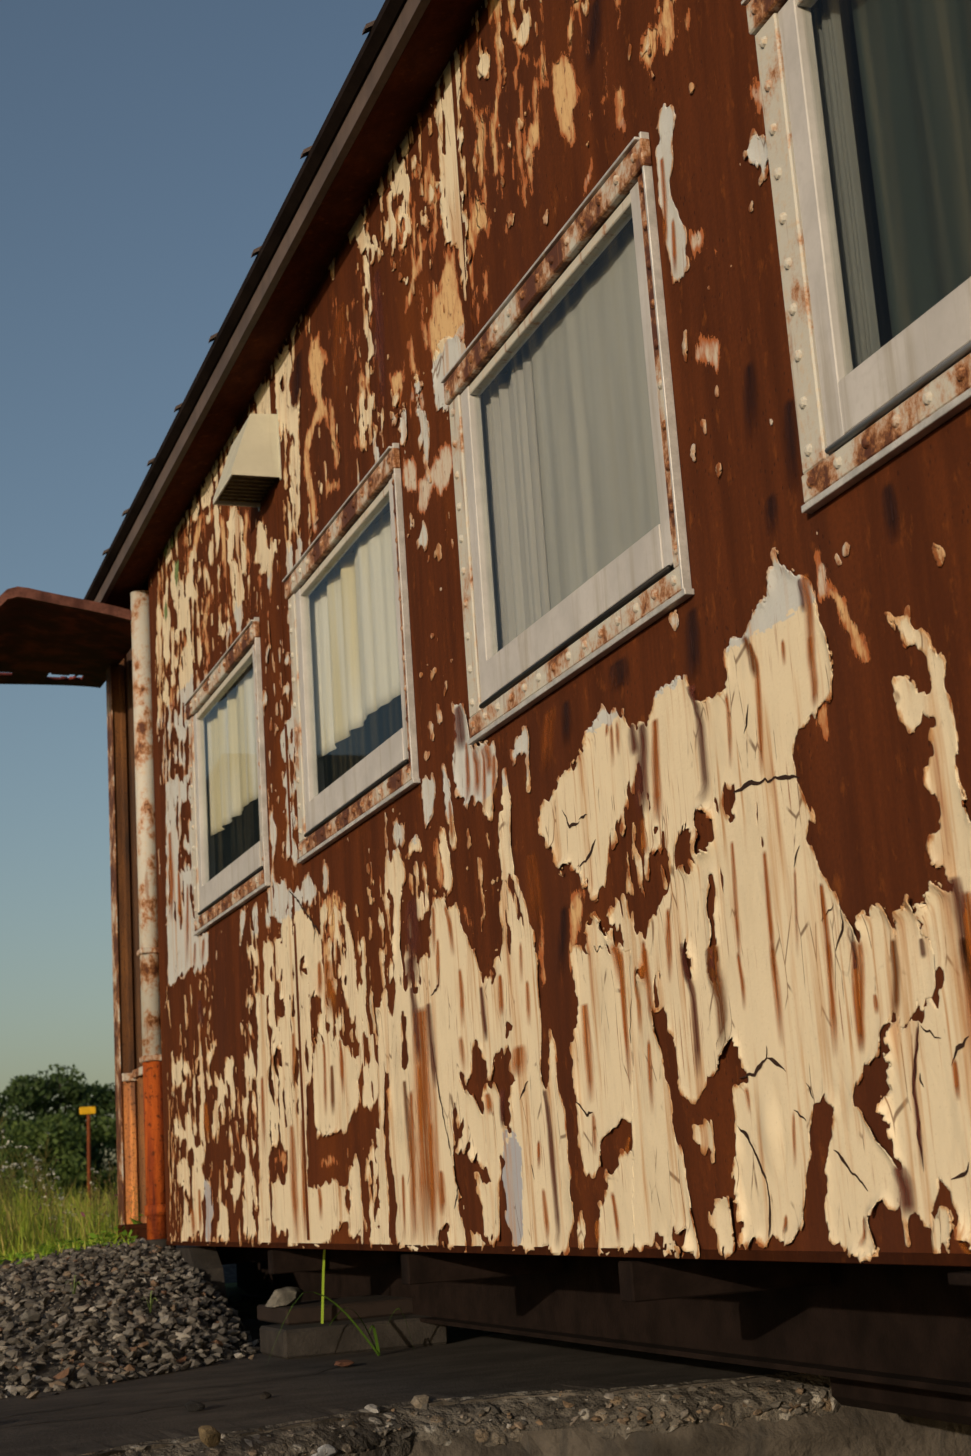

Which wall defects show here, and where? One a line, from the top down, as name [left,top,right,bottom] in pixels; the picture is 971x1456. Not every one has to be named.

peeling [156,0,971,1263]
crack [563,812,596,867]
corrosion [606,720,660,851]
crack [733,775,799,793]
corrosion [402,899,452,1223]
corrosion [611,942,651,1058]
corrosion [666,910,725,1062]
corrosion [763,853,780,1019]
corrosion [848,934,899,1041]
corrosion [912,1028,922,1153]
corrosion [950,878,971,1017]
corrosion [537,1091,559,1232]